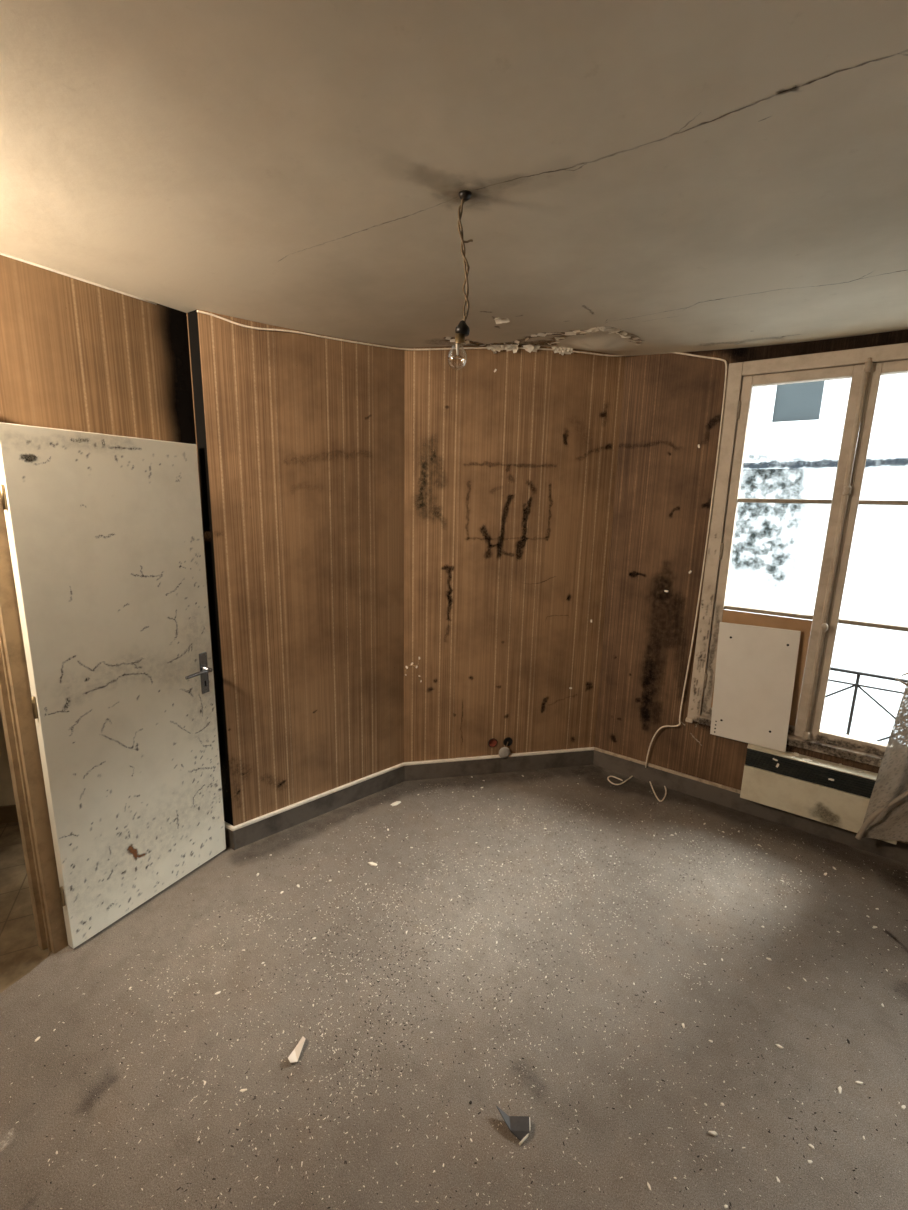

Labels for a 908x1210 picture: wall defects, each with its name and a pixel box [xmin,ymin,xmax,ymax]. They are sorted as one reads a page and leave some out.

crack [789,57,888,90]
crack [690,101,764,129]
peeling [445,327,642,355]
damp [629,571,676,730]